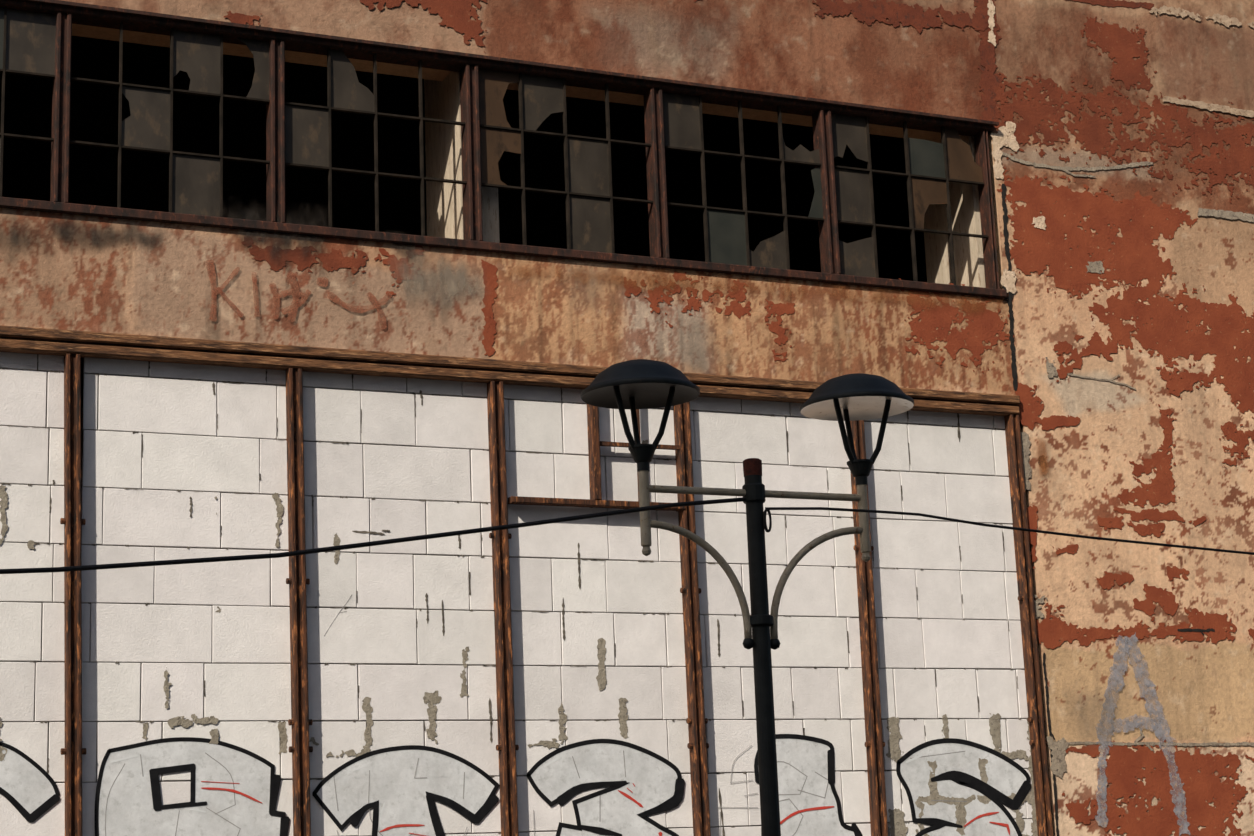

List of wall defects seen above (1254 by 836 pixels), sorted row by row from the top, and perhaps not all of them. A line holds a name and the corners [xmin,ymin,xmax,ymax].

peeling [360,0,487,53]
peeling [241,238,426,295]
peeling [481,259,498,356]
peeling [623,271,797,361]
peeling [812,0,1254,538]
peeling [1027,505,1038,569]
peeling [1052,544,1079,555]
peeling [1034,566,1254,653]
peeling [1046,736,1254,836]